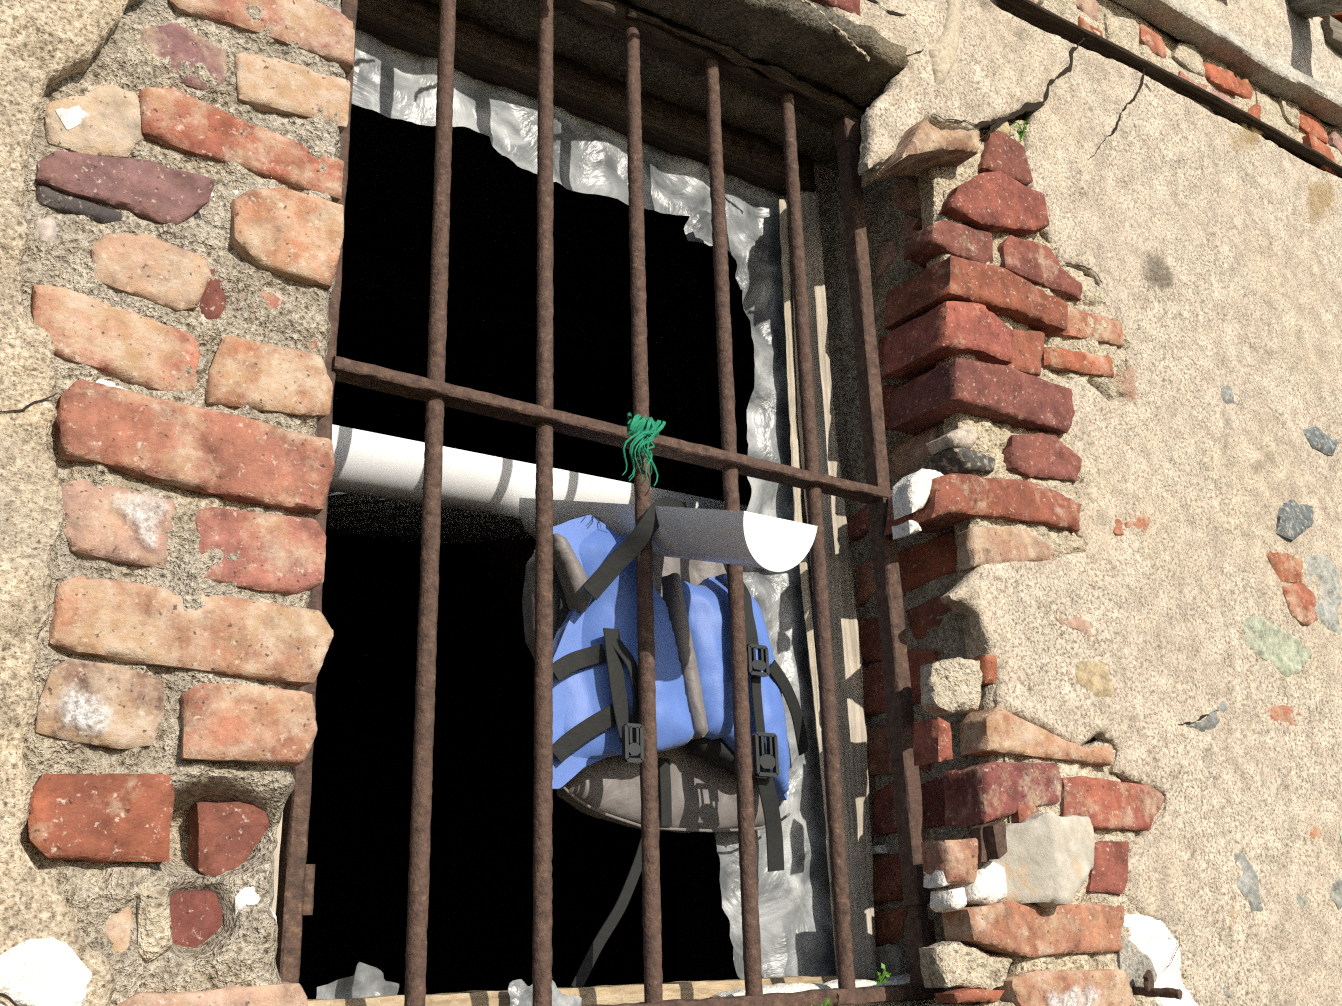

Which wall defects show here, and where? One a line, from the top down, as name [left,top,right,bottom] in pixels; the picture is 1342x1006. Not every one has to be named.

spalling [799,0,870,61]
crack [1088,69,1152,160]
spalling [1221,385,1246,404]
spalling [0,0,355,1006]
spalling [847,119,1198,1006]
spalling [1187,701,1229,732]